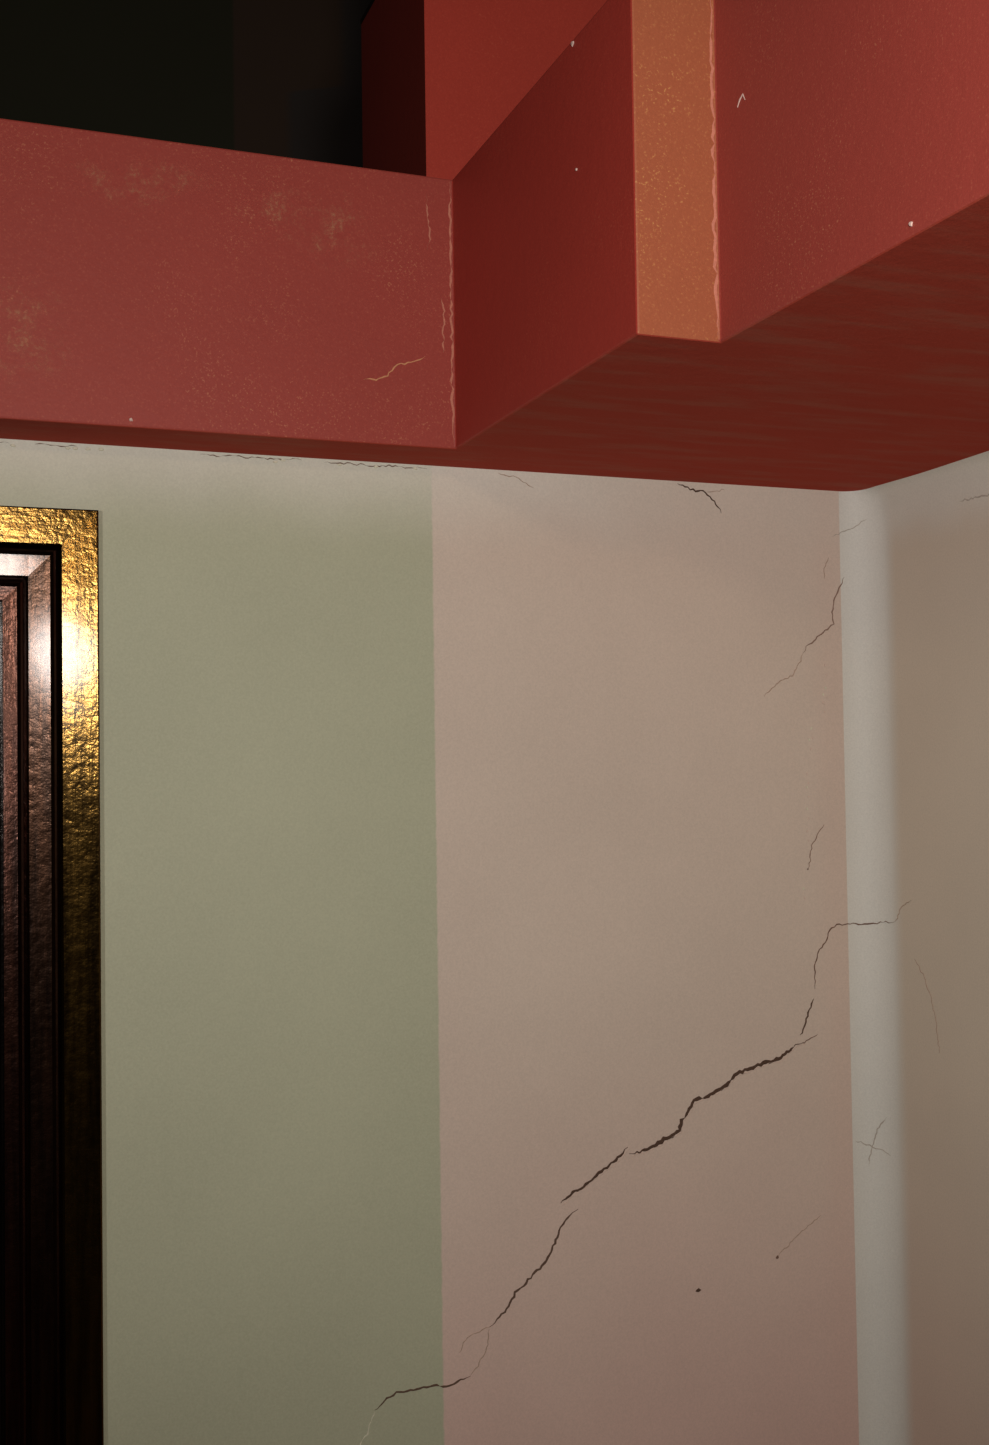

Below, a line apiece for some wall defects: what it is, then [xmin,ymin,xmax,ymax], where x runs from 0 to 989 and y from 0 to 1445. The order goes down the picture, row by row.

crack [767,520,865,693]
crack [360,901,910,1445]